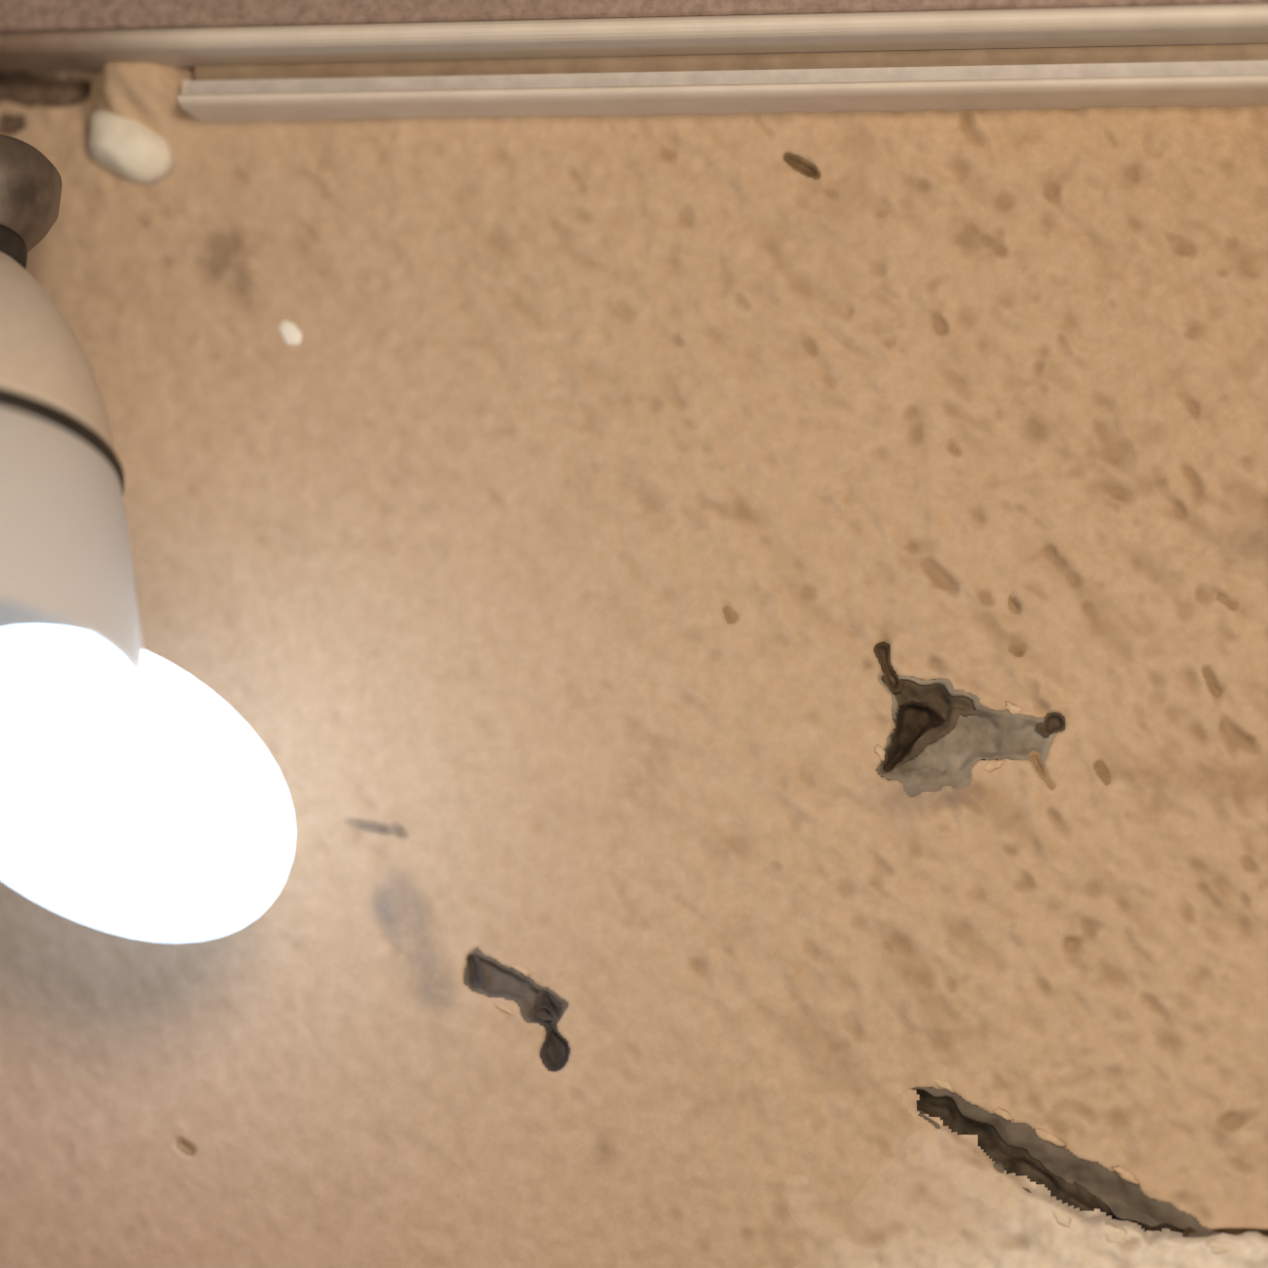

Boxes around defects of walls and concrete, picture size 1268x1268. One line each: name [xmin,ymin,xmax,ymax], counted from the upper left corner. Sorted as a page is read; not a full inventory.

flaking render [873,641,1066,797]
flaking render [463,948,570,1072]
crack [911,1079,1268,1238]